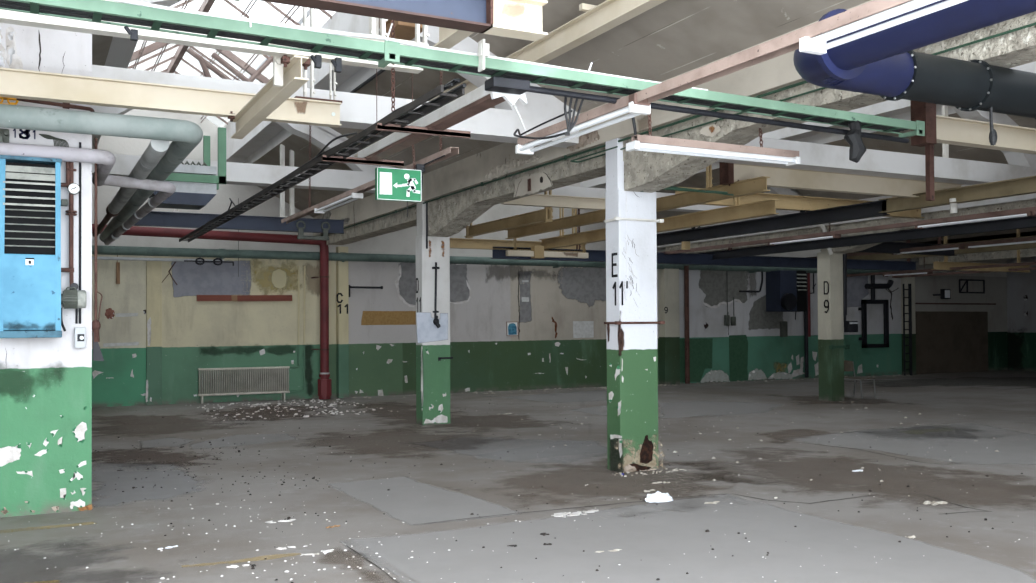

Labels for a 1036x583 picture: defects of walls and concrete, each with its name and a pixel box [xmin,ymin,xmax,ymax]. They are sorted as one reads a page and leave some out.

peeling [0,26,23,70]
rust [607,311,624,356]
peeling [421,346,448,424]
peeling [609,359,624,415]
peeling [701,370,730,383]
peeling [0,406,87,477]
rust [630,435,654,471]
peeling [51,461,86,512]